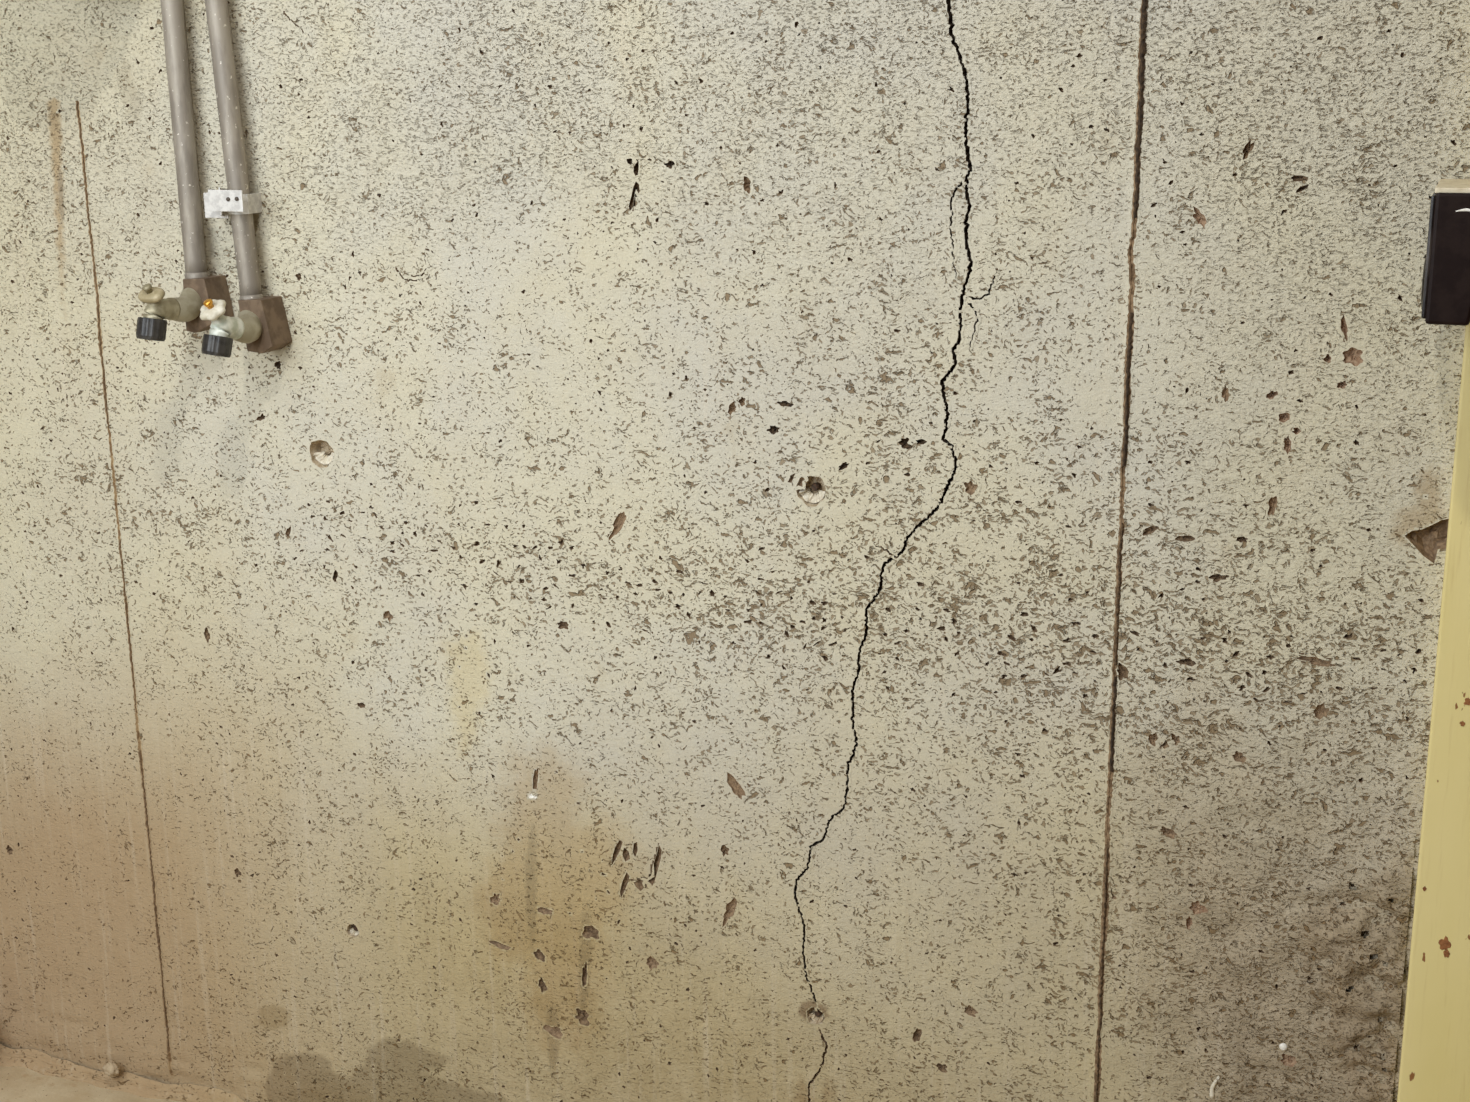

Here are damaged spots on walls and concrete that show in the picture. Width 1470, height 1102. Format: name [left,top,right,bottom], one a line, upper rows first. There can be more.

water stain [249,998,520,1102]
crack [791,0,1000,1102]